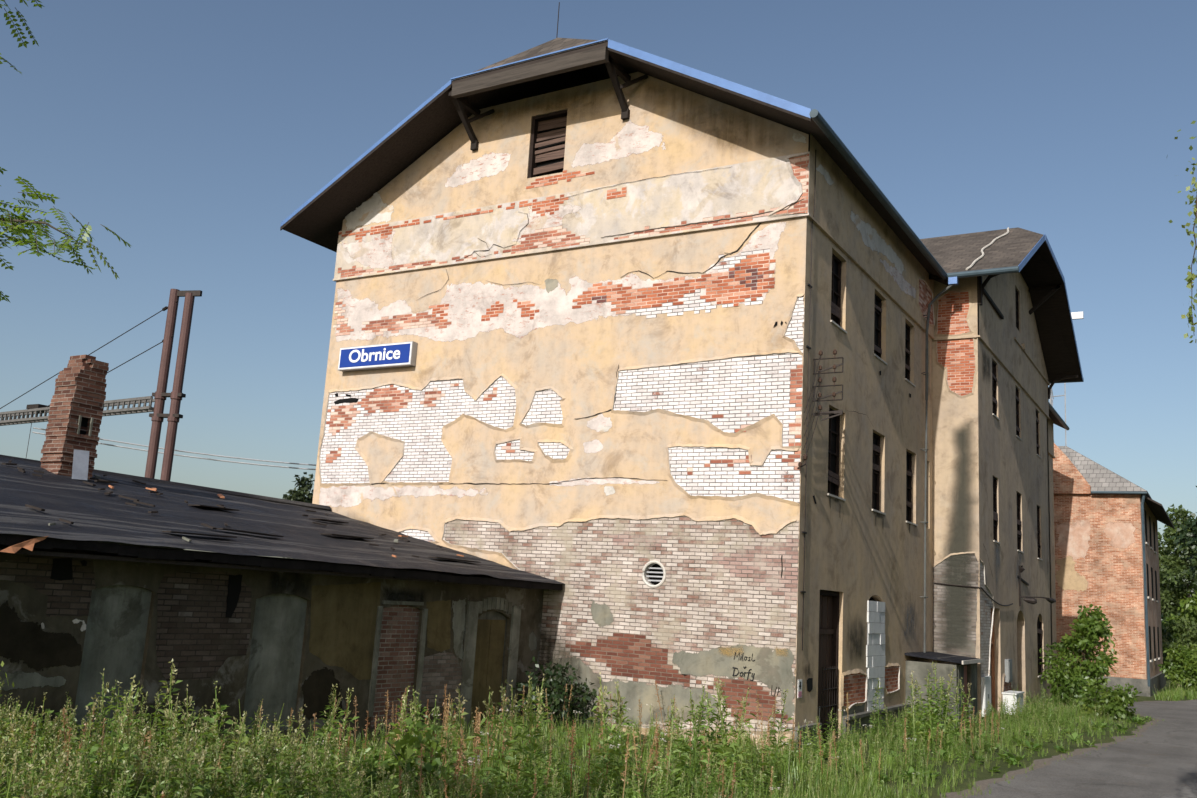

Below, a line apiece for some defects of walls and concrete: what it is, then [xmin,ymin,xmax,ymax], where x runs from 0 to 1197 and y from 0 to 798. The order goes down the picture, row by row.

crack [421,213,536,298]
flaking render [333,119,834,342]
crack [601,199,803,279]
flaking render [850,211,978,399]
flaking render [318,293,817,735]
leakage [944,427,972,647]
leakage [0,600,82,671]